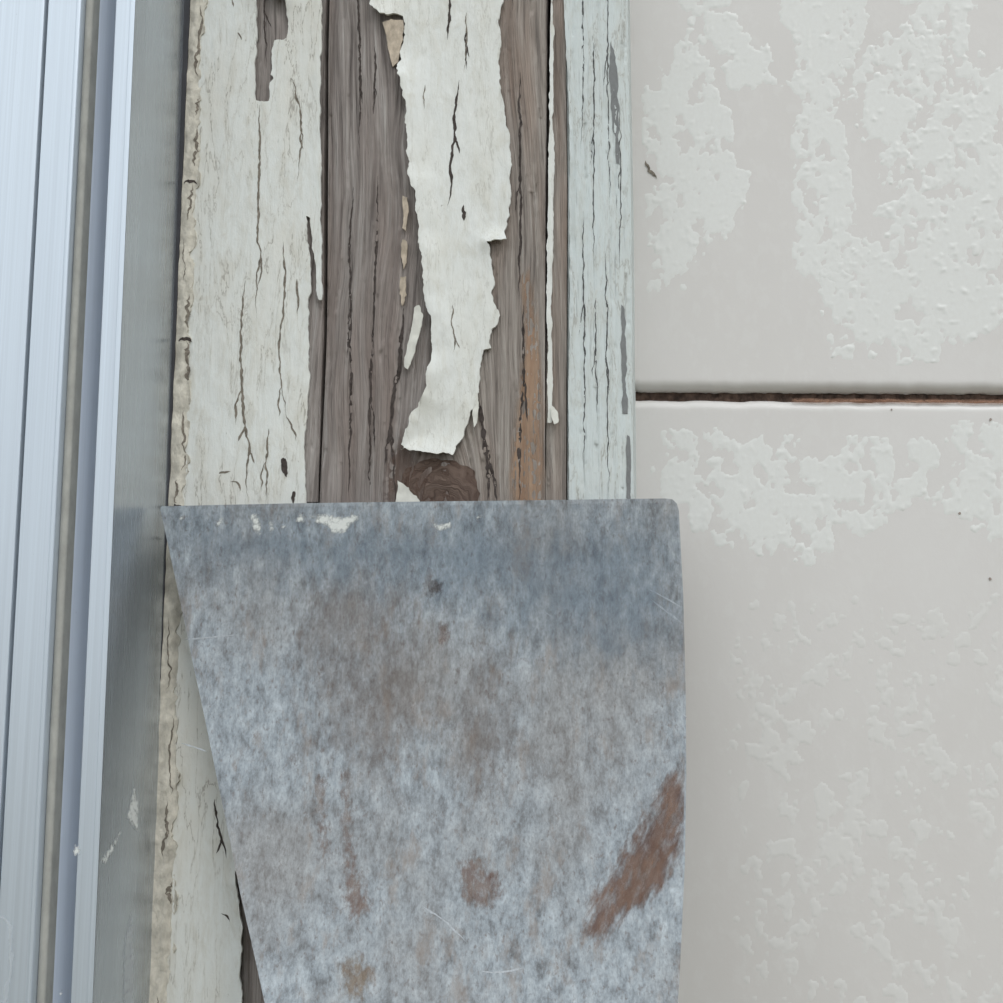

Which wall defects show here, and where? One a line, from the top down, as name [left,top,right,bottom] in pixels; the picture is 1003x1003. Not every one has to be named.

crack [219,105,299,496]
peeling [255,0,288,102]
crack [290,78,303,179]
peeling [291,0,559,503]